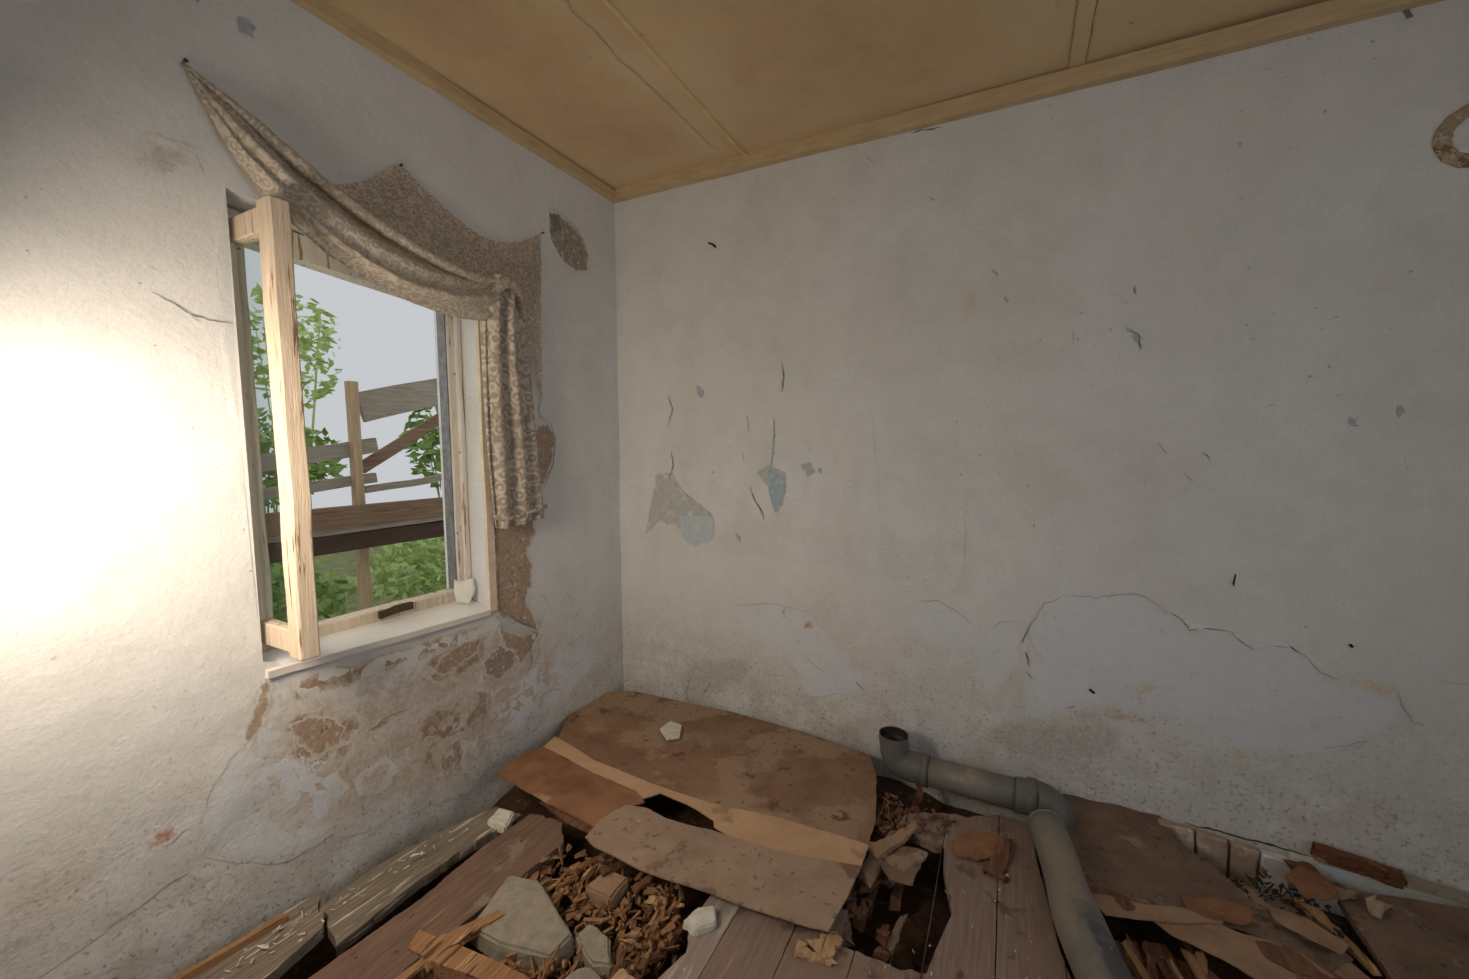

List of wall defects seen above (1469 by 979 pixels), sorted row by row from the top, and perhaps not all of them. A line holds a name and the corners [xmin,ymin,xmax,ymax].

spalling [548,207,590,271]
peeling [536,397,556,490]
peeling [646,451,715,547]
peeling [750,418,822,519]
peeling [199,662,407,864]